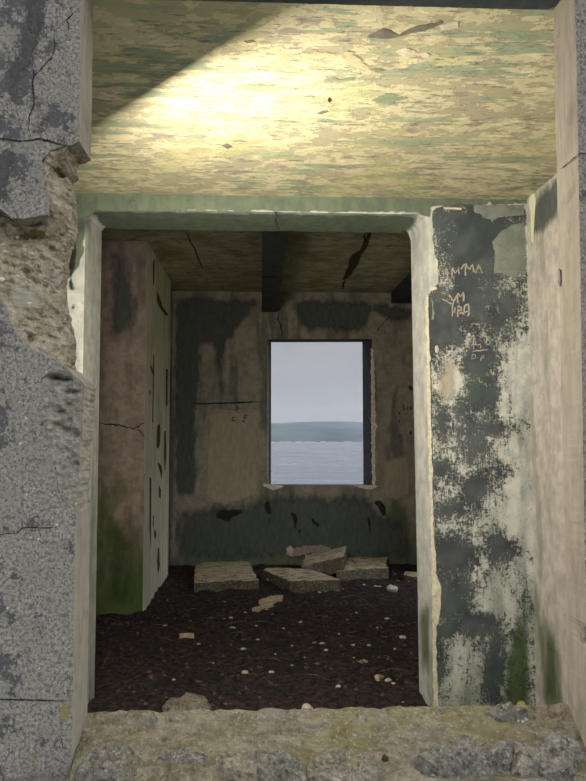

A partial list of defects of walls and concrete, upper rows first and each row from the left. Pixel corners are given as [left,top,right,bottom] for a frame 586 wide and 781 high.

crack [0,10,77,146]
peeling [367,20,458,39]
spalling [0,147,96,514]
water stain [296,300,412,332]
crack [100,422,145,438]
peeling [149,354,166,573]